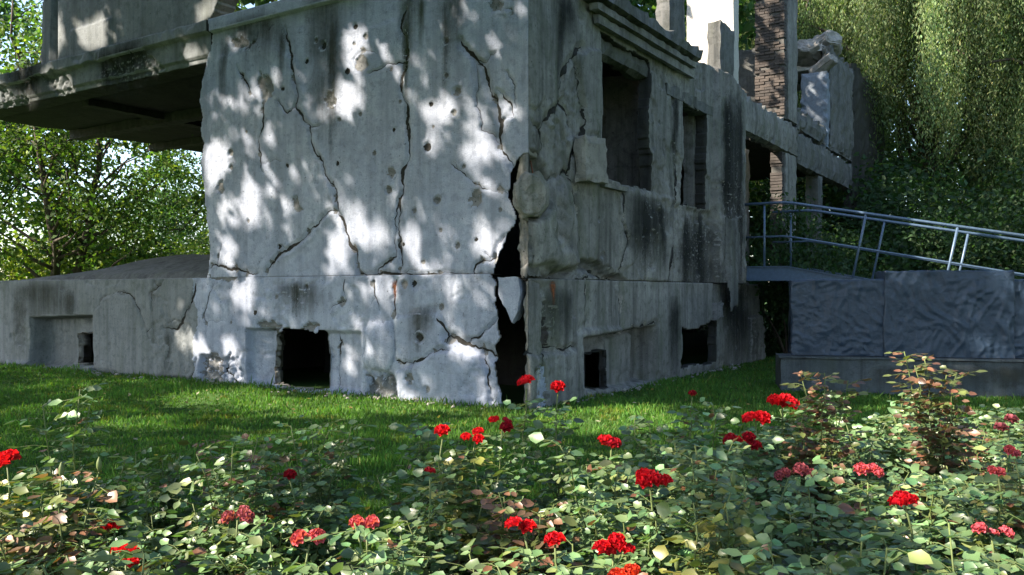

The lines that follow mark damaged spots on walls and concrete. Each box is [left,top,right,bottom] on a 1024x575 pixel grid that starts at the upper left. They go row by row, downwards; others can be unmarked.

crack [99,10,503,332]
leakage [722,107,743,224]
crack [397,41,655,389]
leakage [633,199,665,249]
leakage [680,214,712,283]
spalling [198,352,226,383]
spalling [366,372,430,399]